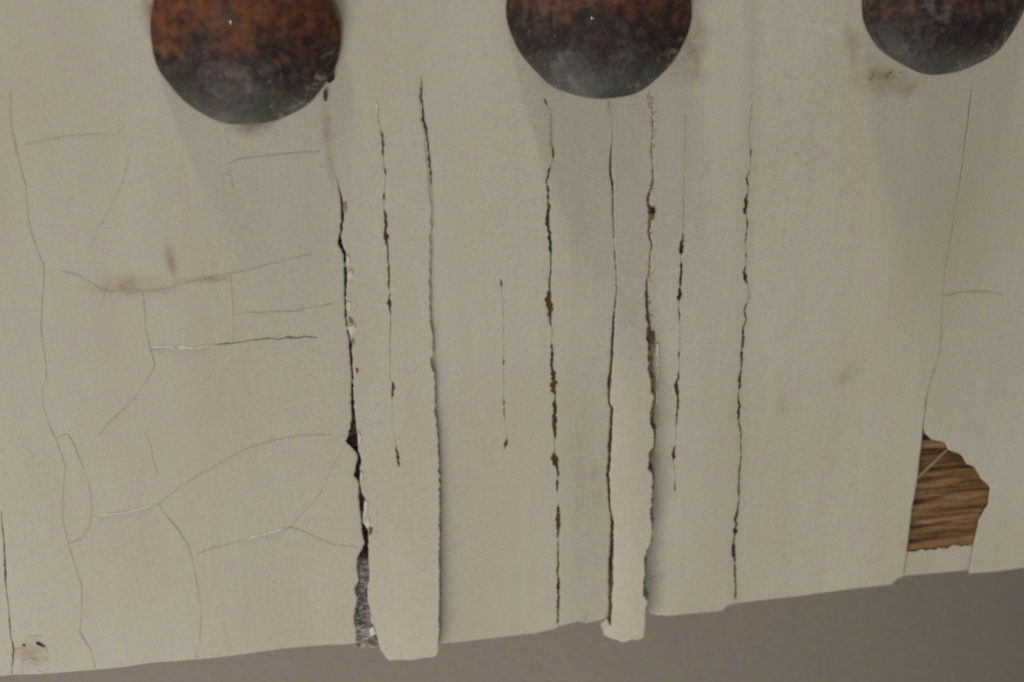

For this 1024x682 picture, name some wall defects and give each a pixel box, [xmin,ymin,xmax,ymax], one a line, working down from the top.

crack [10,91,379,669]
crack [376,101,395,397]
crack [419,81,433,198]
crack [545,144,589,623]
crack [672,190,684,490]
crack [731,100,752,599]
peeling [904,432,988,576]